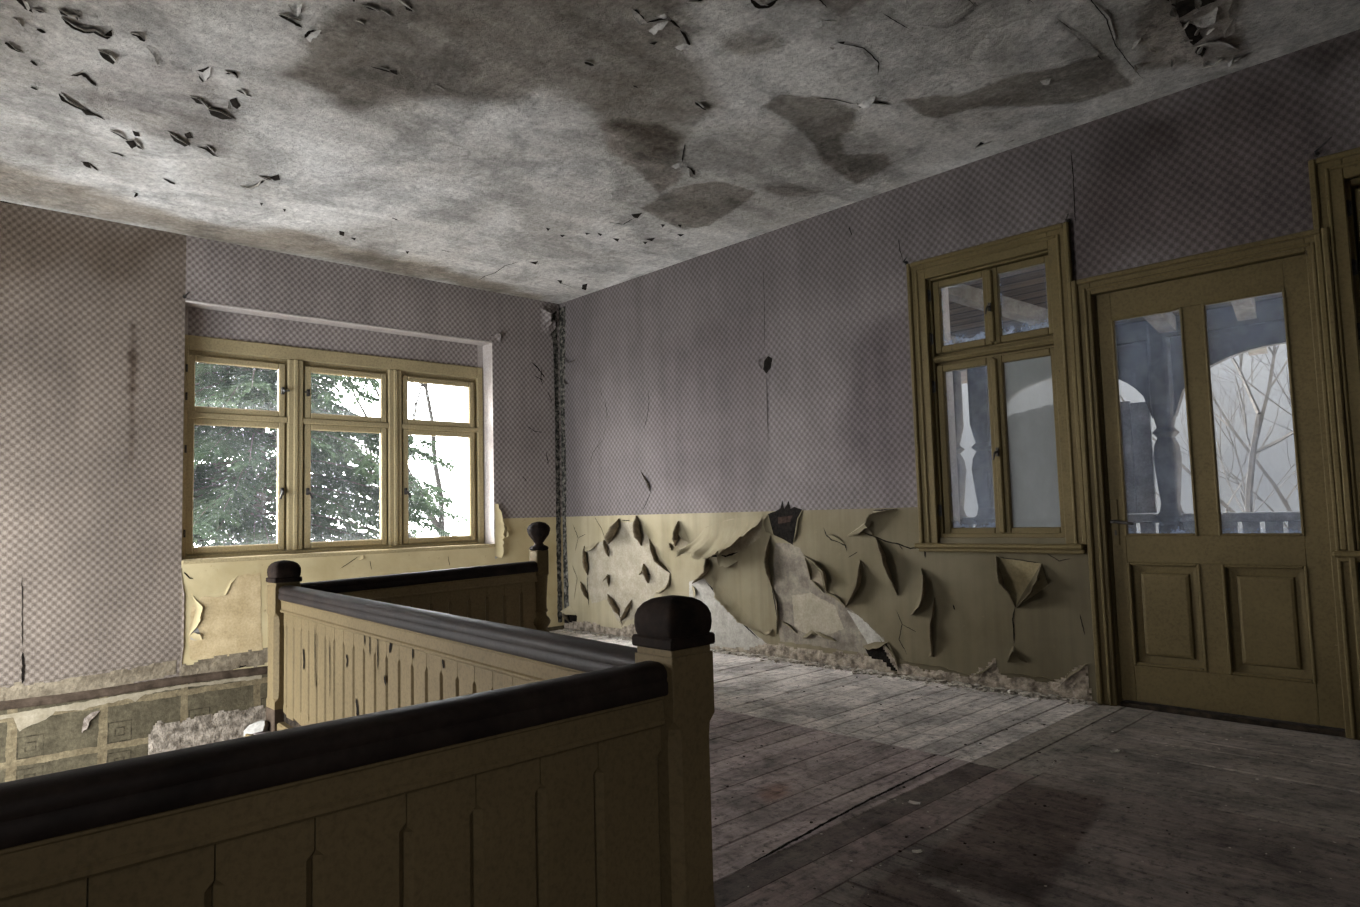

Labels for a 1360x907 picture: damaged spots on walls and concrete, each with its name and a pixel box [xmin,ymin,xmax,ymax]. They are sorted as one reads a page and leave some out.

peeling [13,0,117,64]
peeling [631,8,693,52]
crack [1029,0,1140,76]
peeling [1167,0,1245,72]
peeling [59,93,143,156]
peeling [167,131,218,157]
peeling [190,66,252,120]
crack [19,582,27,683]
peeling [180,568,262,667]
flaking render [560,501,969,676]
peeling [994,556,1087,682]
flaking render [148,705,266,755]